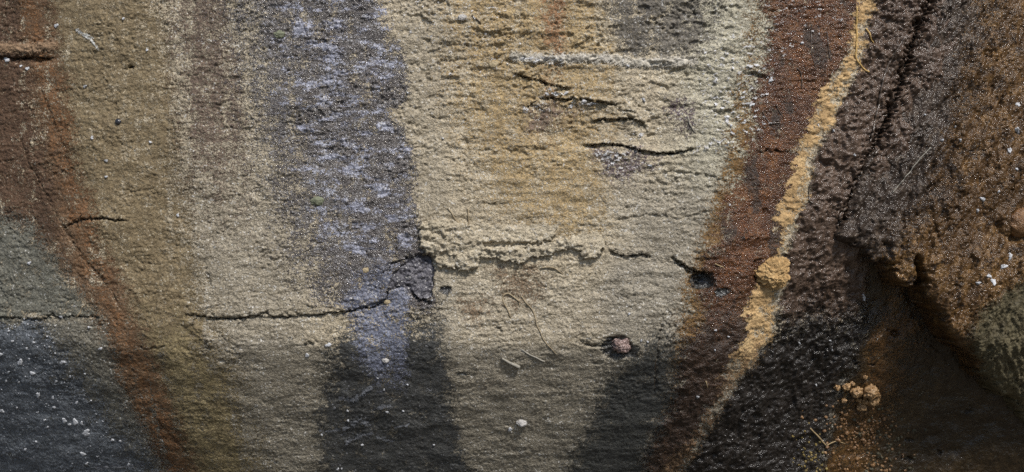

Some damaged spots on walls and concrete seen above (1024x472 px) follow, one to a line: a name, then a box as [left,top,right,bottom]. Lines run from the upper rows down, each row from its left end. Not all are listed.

crack [515,73,695,157]
crack [18,140,121,293]
crack [185,257,430,326]
leakage [0,0,806,472]
peeling [388,219,607,302]